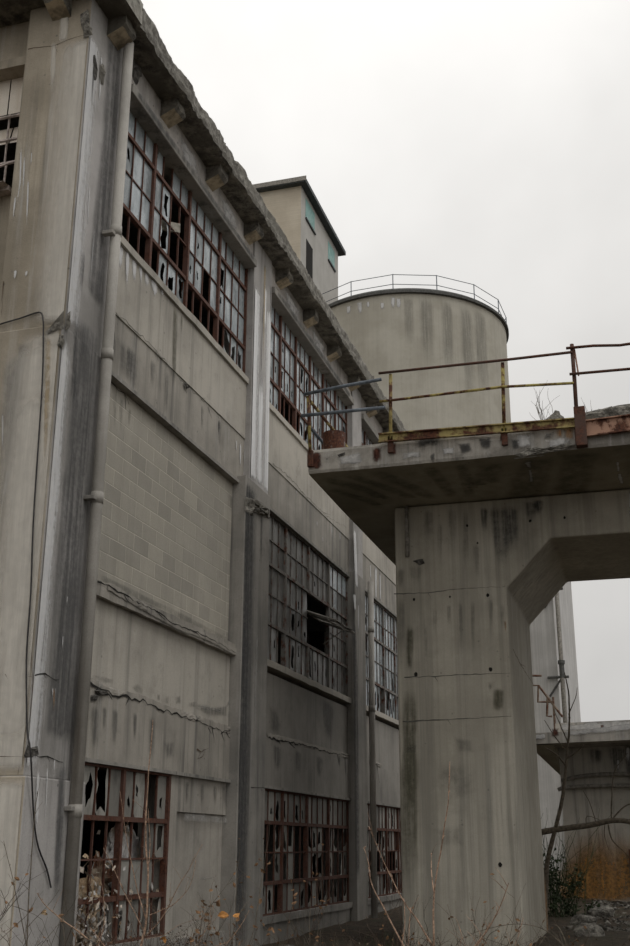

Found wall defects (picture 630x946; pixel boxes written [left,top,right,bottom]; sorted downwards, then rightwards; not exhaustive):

leakage [0,17,117,881]
crack [97,581,236,655]
crack [90,678,230,739]
crack [268,733,349,764]